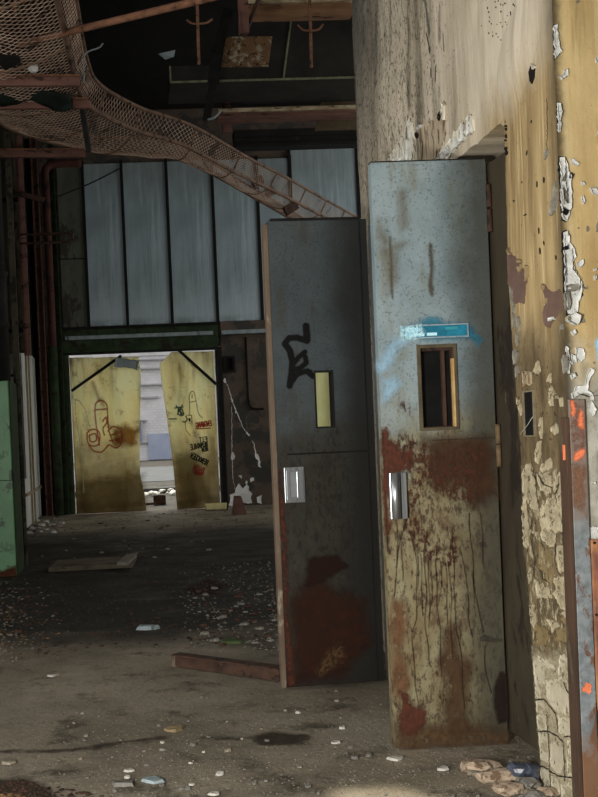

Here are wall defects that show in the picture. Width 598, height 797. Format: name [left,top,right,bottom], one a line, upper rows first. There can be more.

spalling [552,24,562,60]
spalling [387,101,475,161]
spalling [536,156,598,336]
peeling [506,247,530,378]
peeling [533,345,597,417]
peeling [228,475,262,506]
peeling [589,526,598,539]
rust [379,427,509,750]
rust [590,539,598,709]